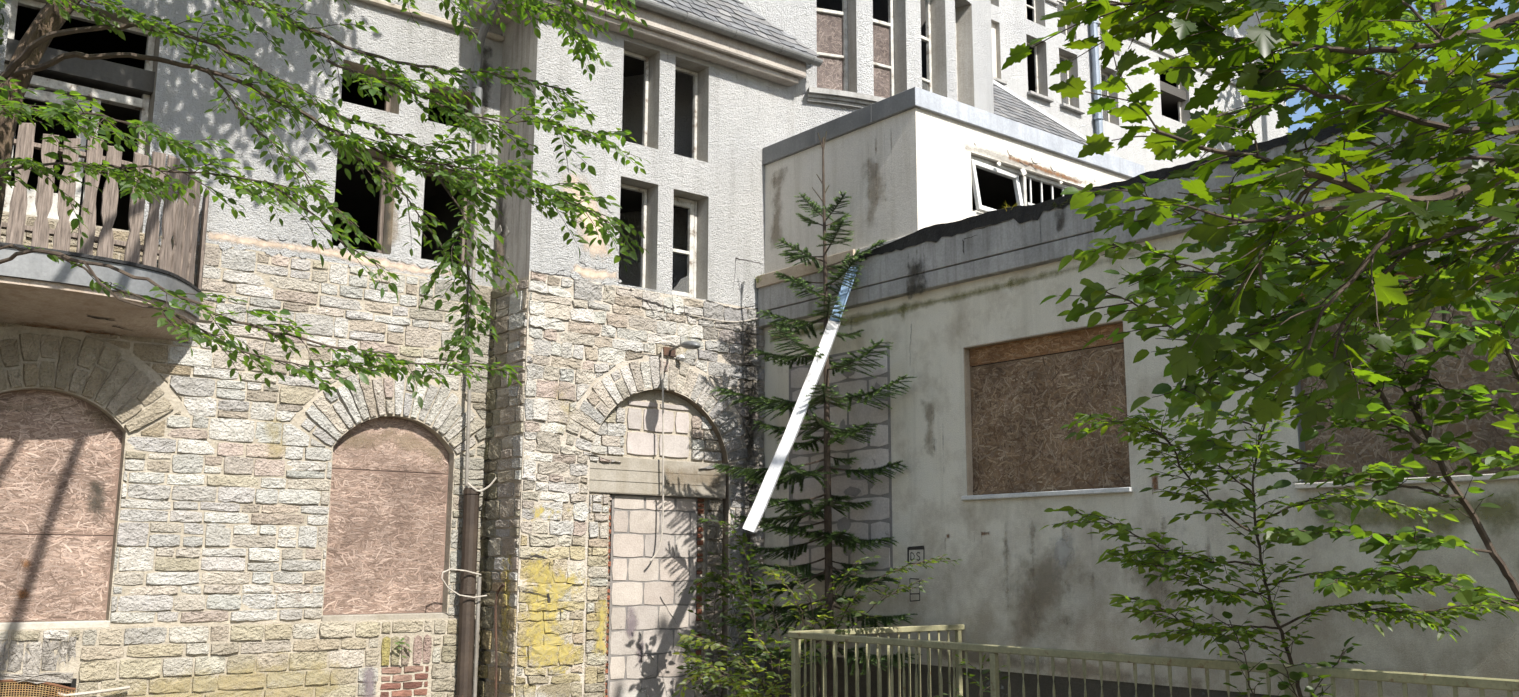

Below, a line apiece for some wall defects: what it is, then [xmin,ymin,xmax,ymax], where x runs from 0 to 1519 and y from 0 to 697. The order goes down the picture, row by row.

flaking render [380,634,432,697]